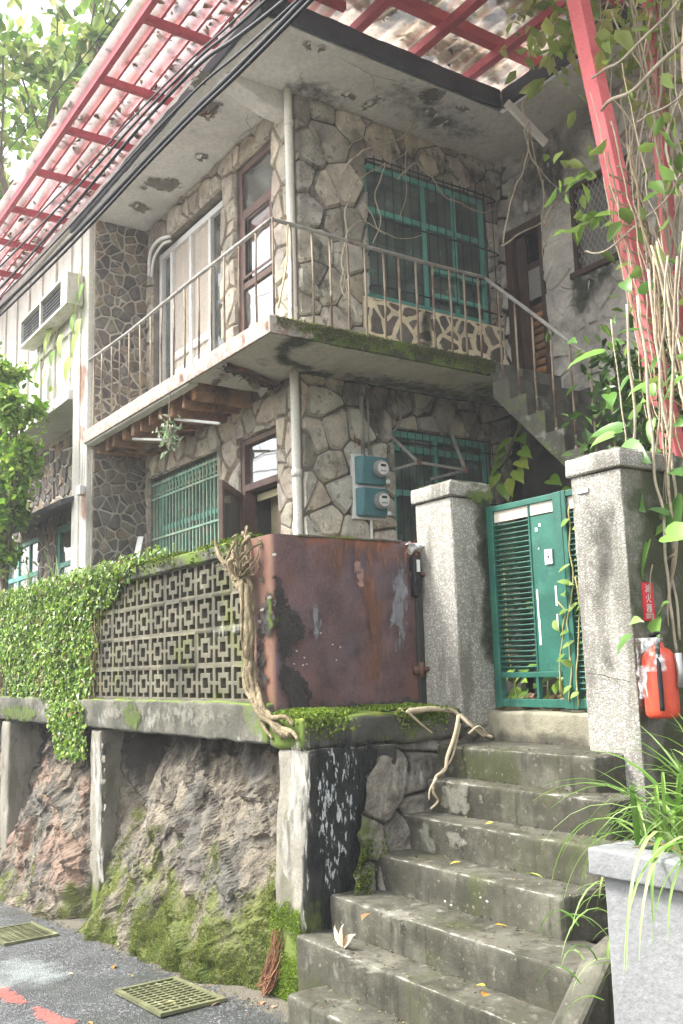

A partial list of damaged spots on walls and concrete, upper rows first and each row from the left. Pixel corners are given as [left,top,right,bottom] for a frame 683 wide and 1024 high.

spalling [198,102,224,121]
peeling [130,178,182,214]
rust [255,555,313,708]
damp [283,750,309,878]